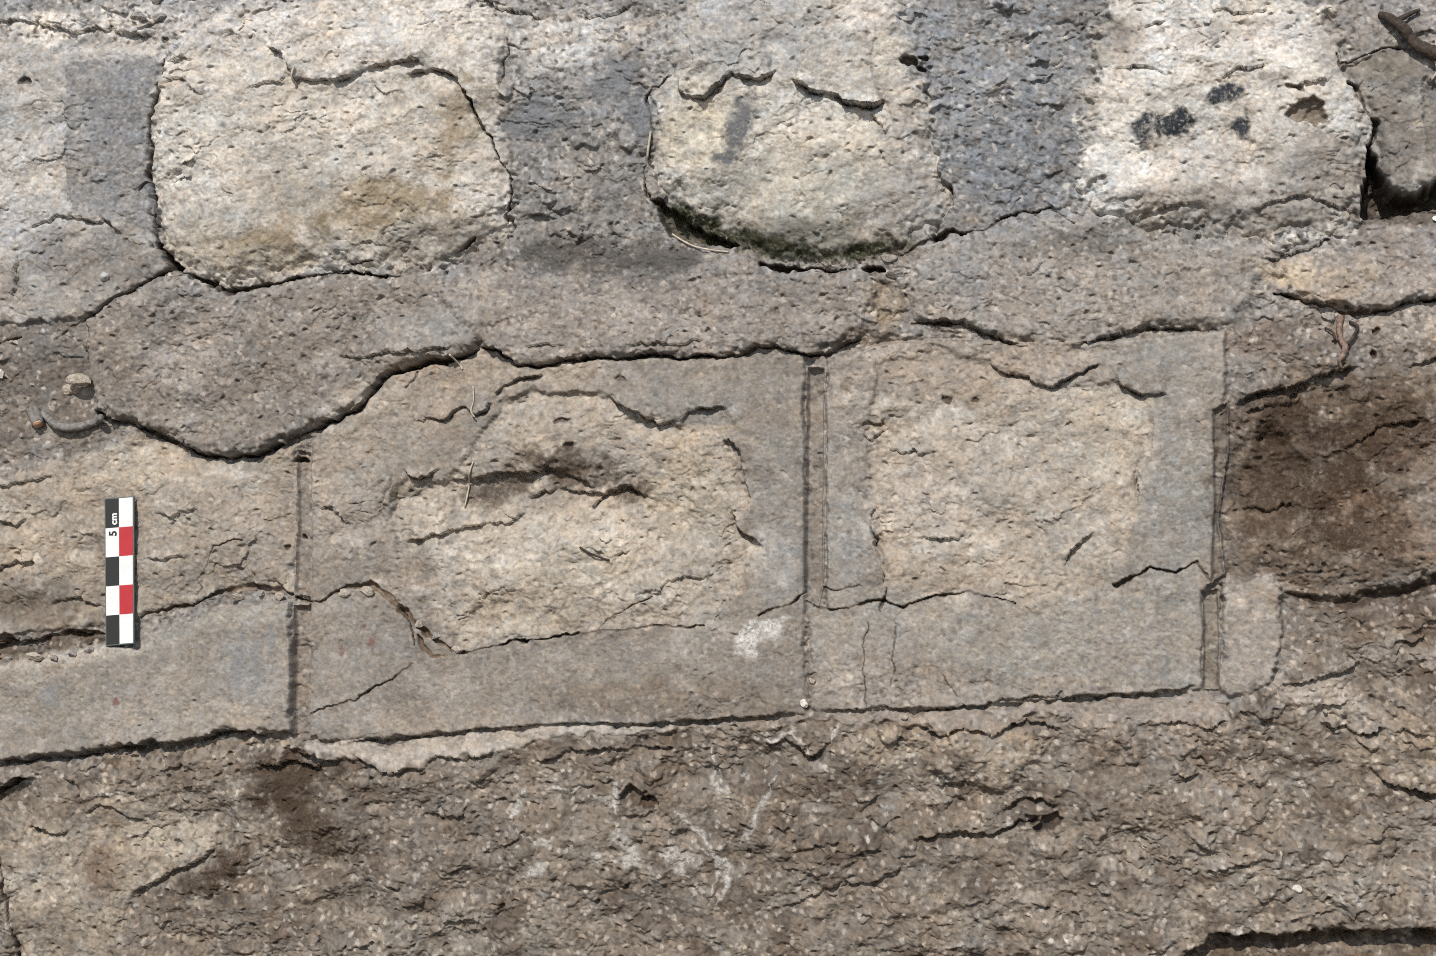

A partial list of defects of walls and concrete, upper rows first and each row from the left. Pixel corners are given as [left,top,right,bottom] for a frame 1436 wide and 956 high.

crack [55,88,388,350]
crack [457,38,513,254]
crack [643,75,671,199]
spalling [1360,147,1436,221]
crack [100,340,862,461]
damp [1216,391,1436,557]
crack [57,629,106,639]
crack [142,539,705,714]
crack [758,585,1016,708]
crack [1113,561,1210,589]
crack [0,746,133,794]
crack [205,730,246,742]